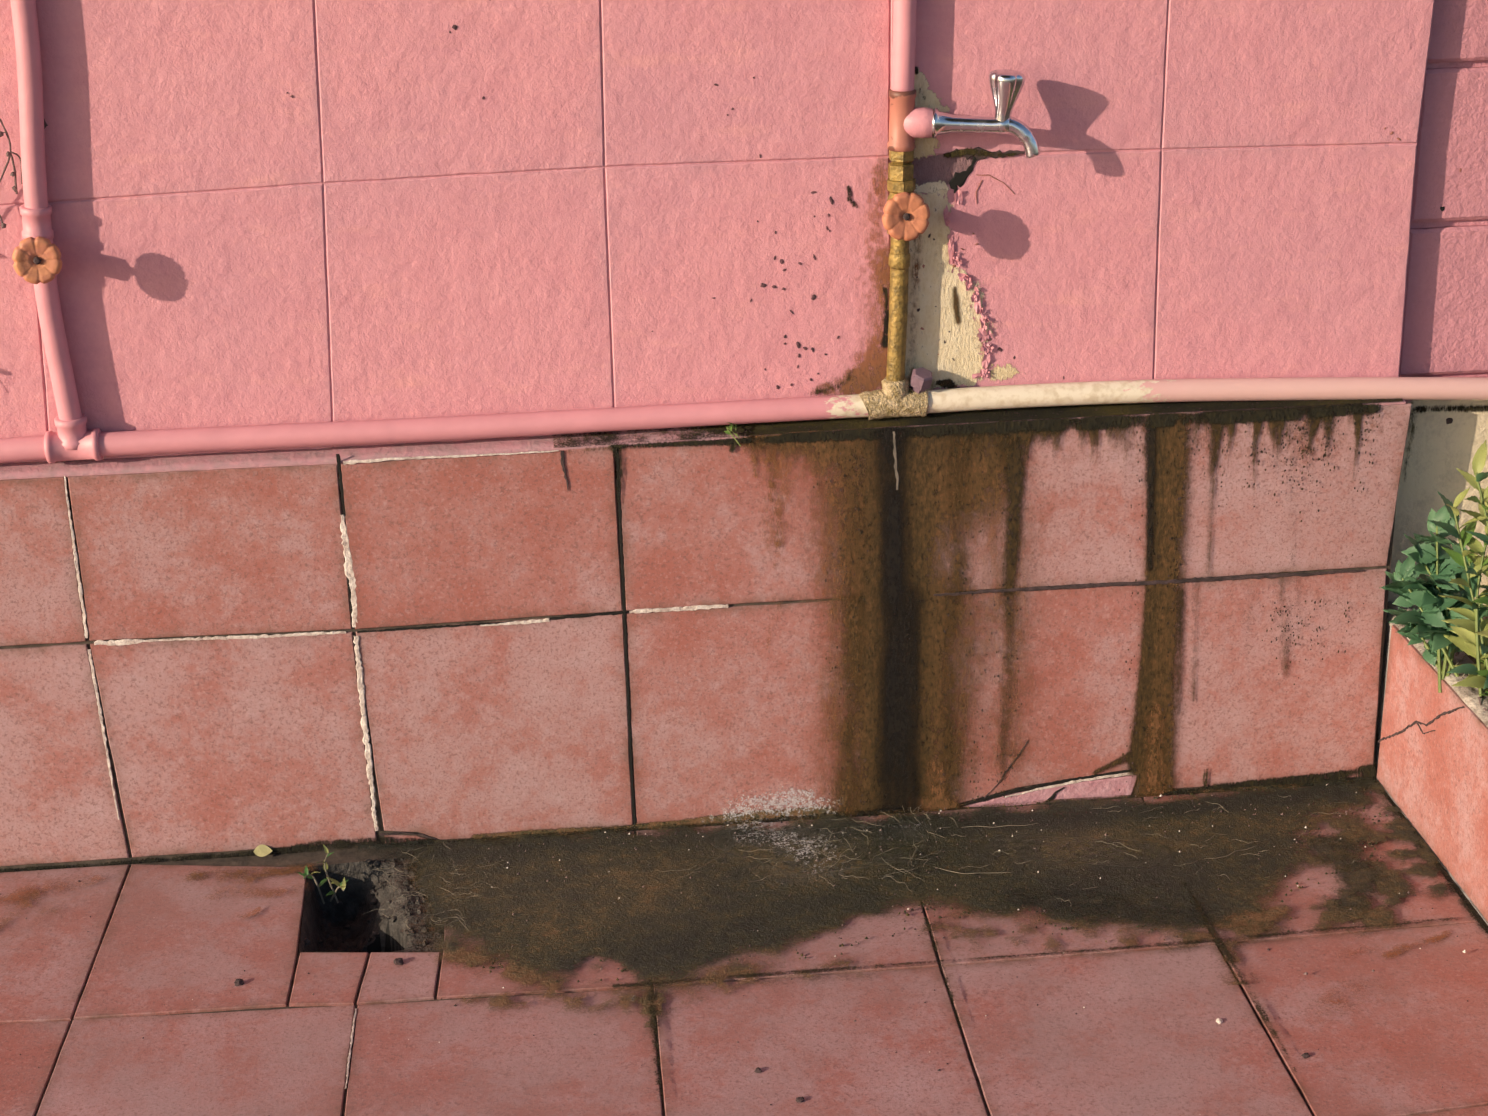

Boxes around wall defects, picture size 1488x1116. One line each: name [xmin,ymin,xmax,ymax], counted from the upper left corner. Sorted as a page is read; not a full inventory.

peeling [914,67,950,113]
corrosion [814,165,890,395]
peeling [905,137,1025,390]
leakage [472,403,1381,867]
crack [958,740,1128,807]
crack [1378,706,1464,743]
spalling [299,856,443,954]